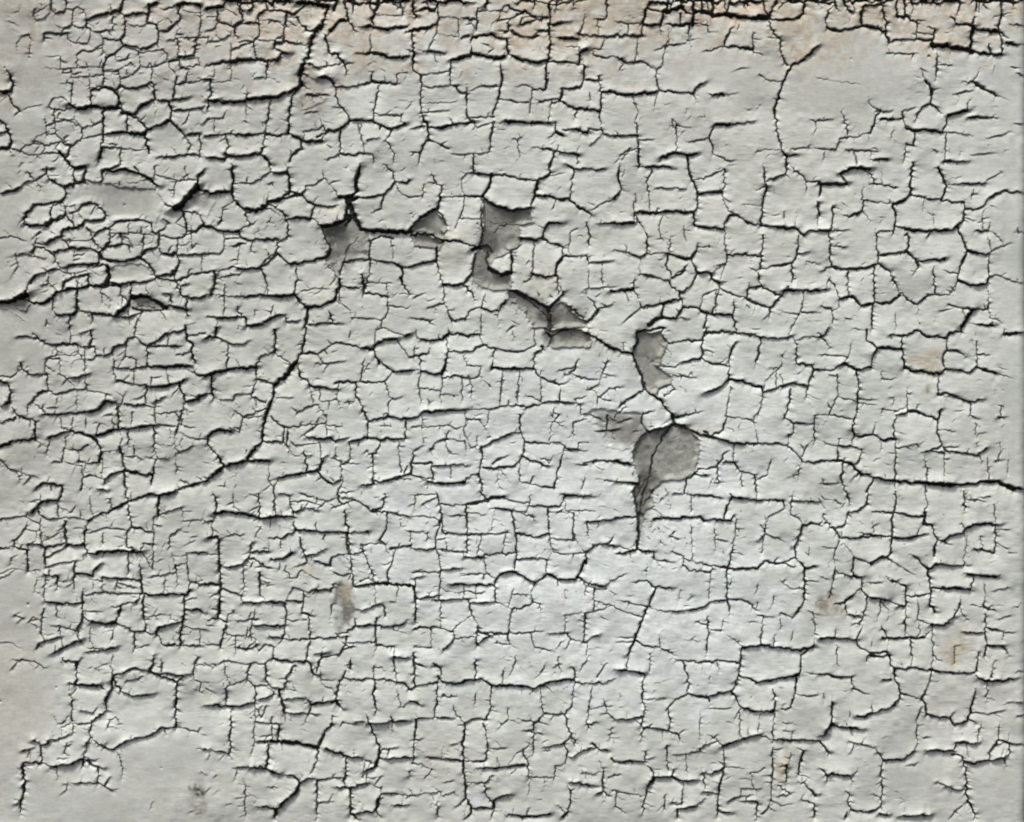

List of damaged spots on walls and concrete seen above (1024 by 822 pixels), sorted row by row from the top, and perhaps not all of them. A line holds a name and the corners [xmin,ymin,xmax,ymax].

crack [705,24,763,58]
crack [916,68,941,119]
peeling [319,218,373,282]
peeling [407,207,450,255]
peeling [468,196,596,351]
crack [559,355,621,406]
peeling [631,328,675,399]
crack [577,459,634,471]
peeling [580,406,703,552]
crack [560,745,702,818]
crack [727,748,791,818]
crack [926,724,1022,819]